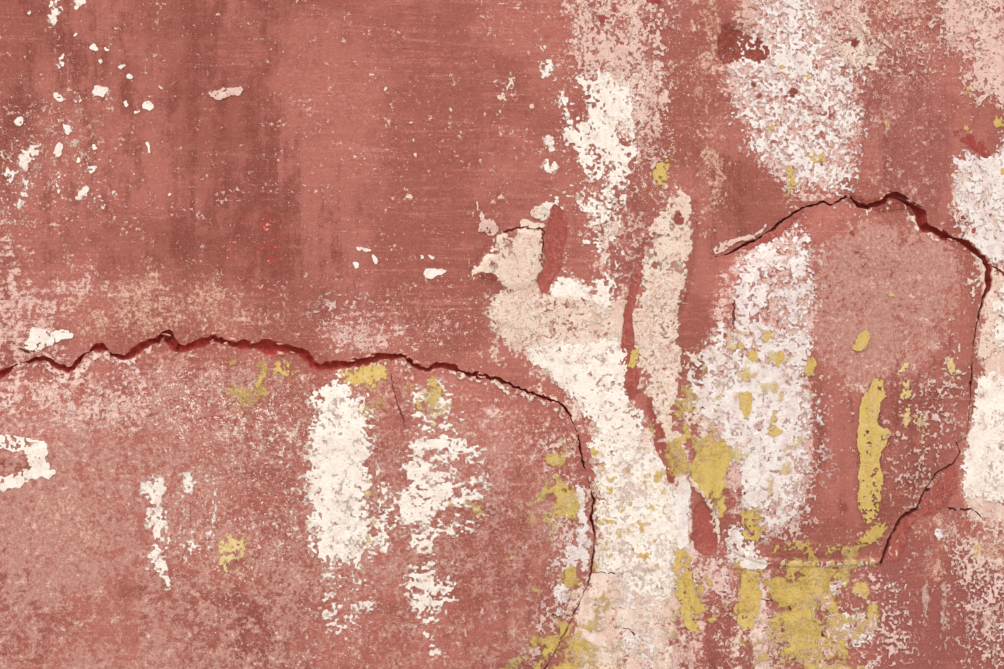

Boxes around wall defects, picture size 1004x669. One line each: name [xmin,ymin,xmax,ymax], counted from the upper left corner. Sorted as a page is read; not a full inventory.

peeling [47,0,86,28]
peeling [92,85,109,97]
peeling [124,100,154,114]
peeling [0,119,97,220]
crack [715,192,1004,320]
peeling [0,327,170,436]
peeling [209,0,1004,669]
crack [729,296,737,339]
peeling [0,434,56,492]
peeling [140,472,247,591]
crack [0,330,677,642]
crack [880,462,1000,561]